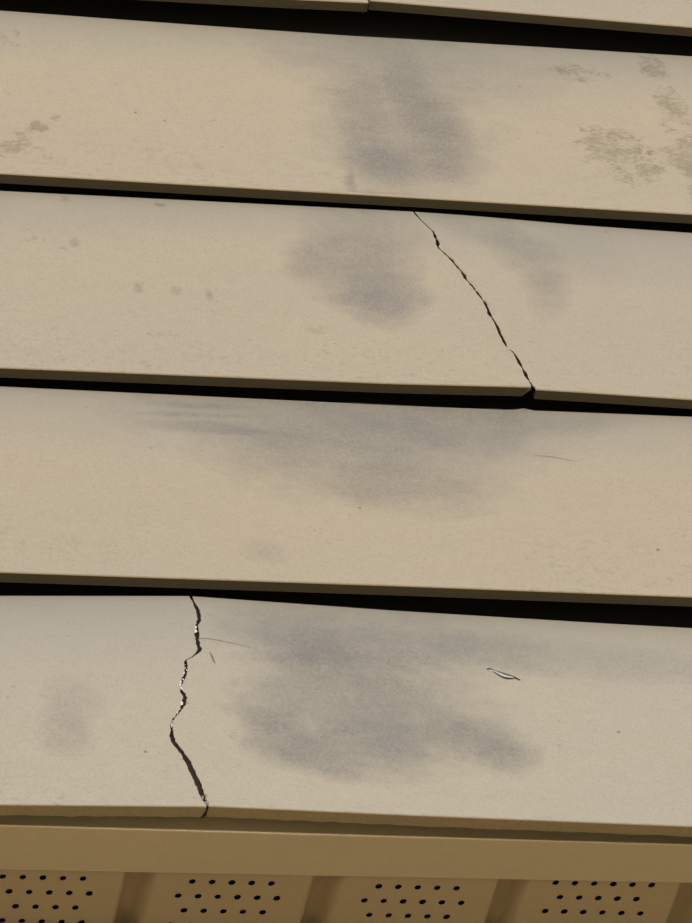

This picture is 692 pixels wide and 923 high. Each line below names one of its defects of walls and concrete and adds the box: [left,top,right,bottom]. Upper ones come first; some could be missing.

crack [433,233,534,387]
crack [169,600,256,818]